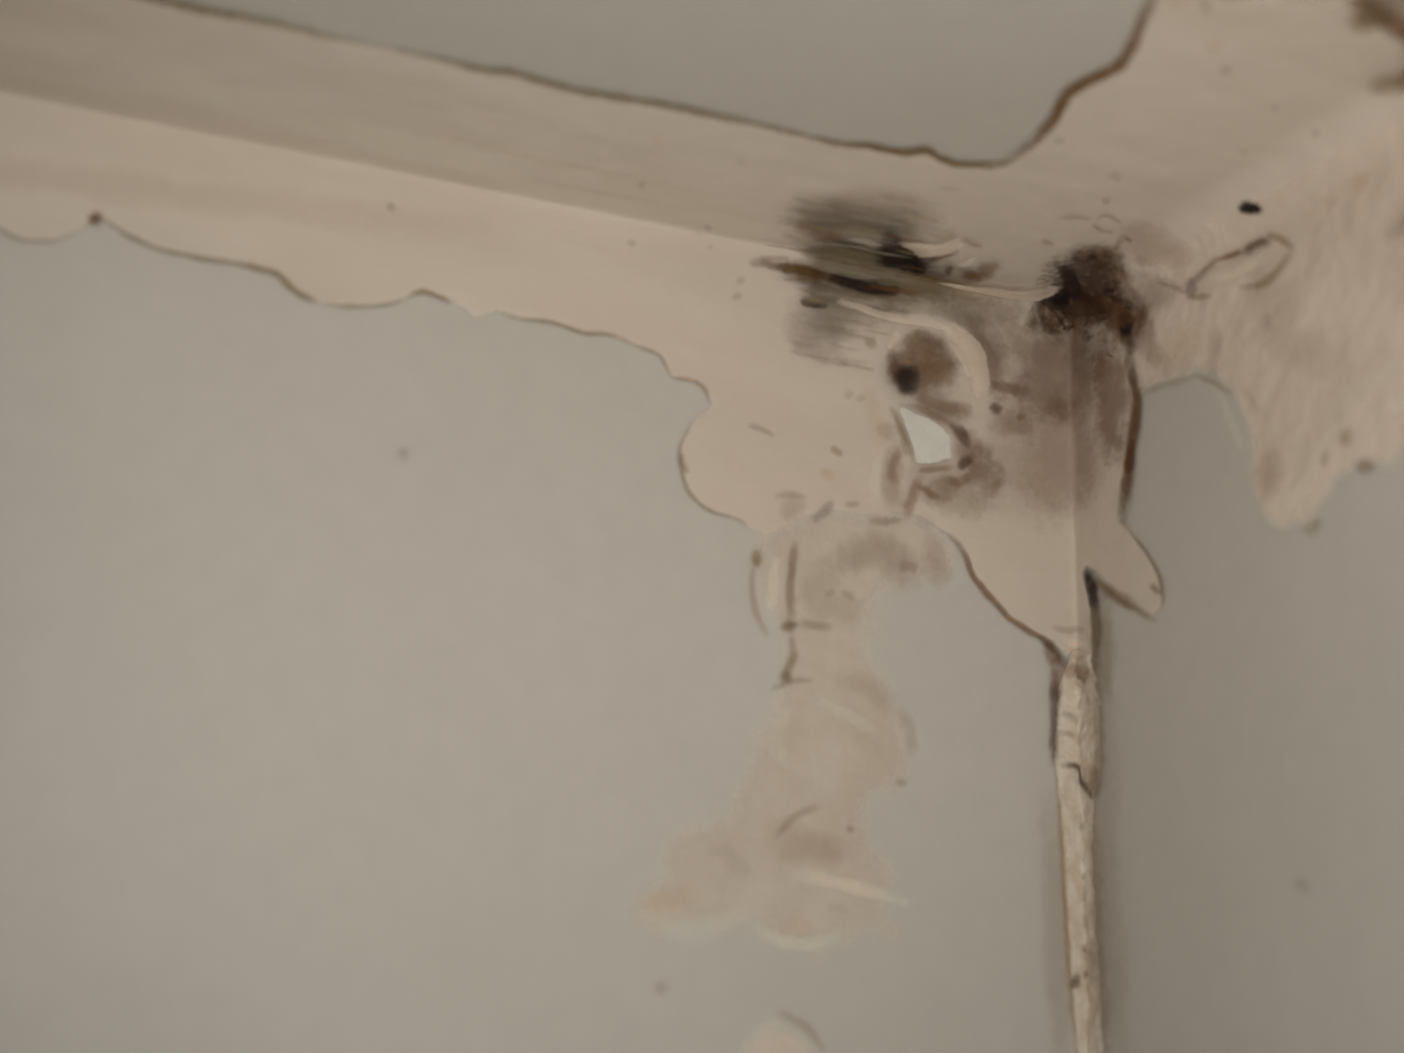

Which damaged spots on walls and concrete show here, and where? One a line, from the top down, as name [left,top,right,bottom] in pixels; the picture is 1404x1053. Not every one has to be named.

peeling [0,0,1404,659]
damp [775,264,896,295]
damp [881,236,951,274]
damp [1040,250,1132,346]
crack [1053,648,1104,1053]